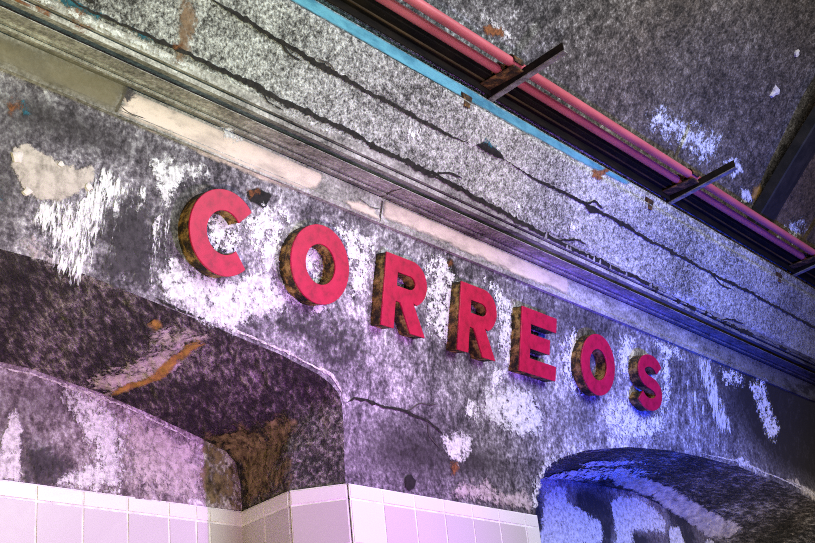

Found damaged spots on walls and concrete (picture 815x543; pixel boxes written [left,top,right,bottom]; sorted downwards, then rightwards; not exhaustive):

corrosion [174,0,198,61]
flaking render [10,143,95,202]
crack [71,0,815,364]
leakage [29,167,170,289]
corrosion [112,342,205,395]
crack [347,397,449,448]
corrosion [200,414,297,510]